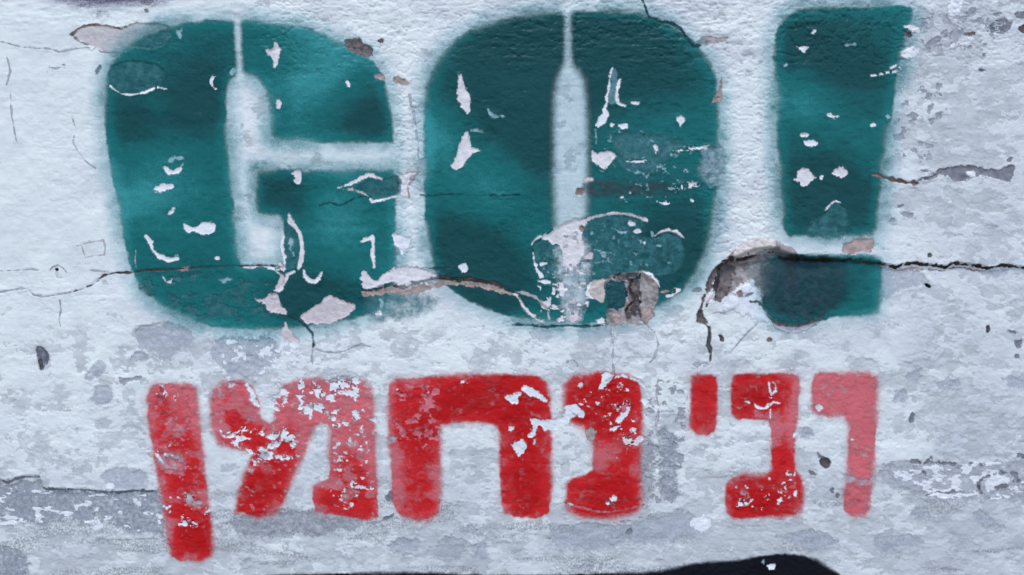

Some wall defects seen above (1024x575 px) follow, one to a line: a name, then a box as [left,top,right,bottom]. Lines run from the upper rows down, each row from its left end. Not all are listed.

crack [641,0,701,48]
peeling [451,128,483,170]
peeling [531,67,725,326]
crack [872,169,938,185]
crack [0,239,275,326]
peeling [300,294,432,325]
crack [360,263,615,372]
crack [693,263,757,367]
spalling [704,200,874,342]
crack [852,261,1024,272]
peeling [130,214,379,539]
peeling [505,372,704,554]